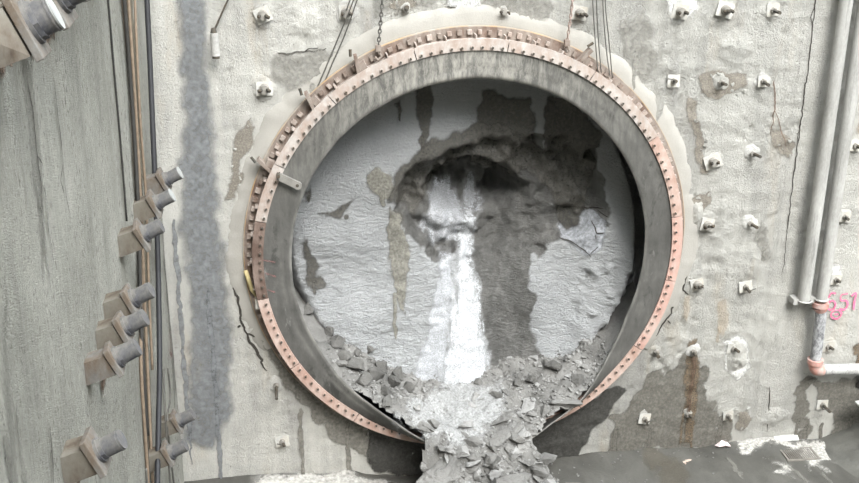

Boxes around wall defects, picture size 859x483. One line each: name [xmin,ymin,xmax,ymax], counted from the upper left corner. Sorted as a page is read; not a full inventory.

crack [771,0,816,275]